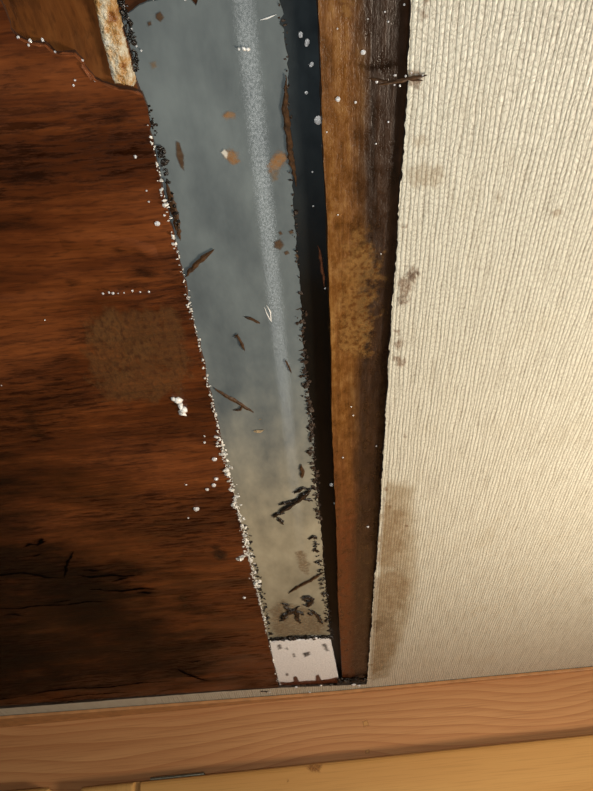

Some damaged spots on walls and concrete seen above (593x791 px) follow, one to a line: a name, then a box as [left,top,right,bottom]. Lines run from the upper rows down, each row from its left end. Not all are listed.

spalling [295,308,324,547]